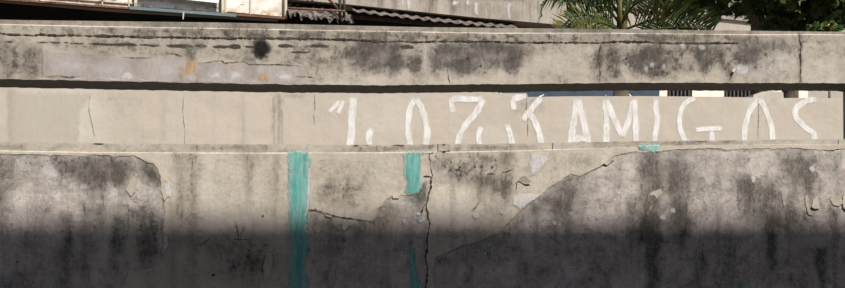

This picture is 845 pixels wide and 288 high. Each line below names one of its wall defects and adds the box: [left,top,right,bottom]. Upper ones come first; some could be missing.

water stain [102,65,173,82]
water stain [24,27,267,71]
water stain [204,68,241,83]
water stain [276,71,292,82]
water stain [278,30,529,77]
water stain [34,157,126,213]
peeling [0,154,171,288]
crack [420,151,461,288]
peeling [304,148,845,288]
water stain [628,157,699,288]
water stain [738,176,805,264]